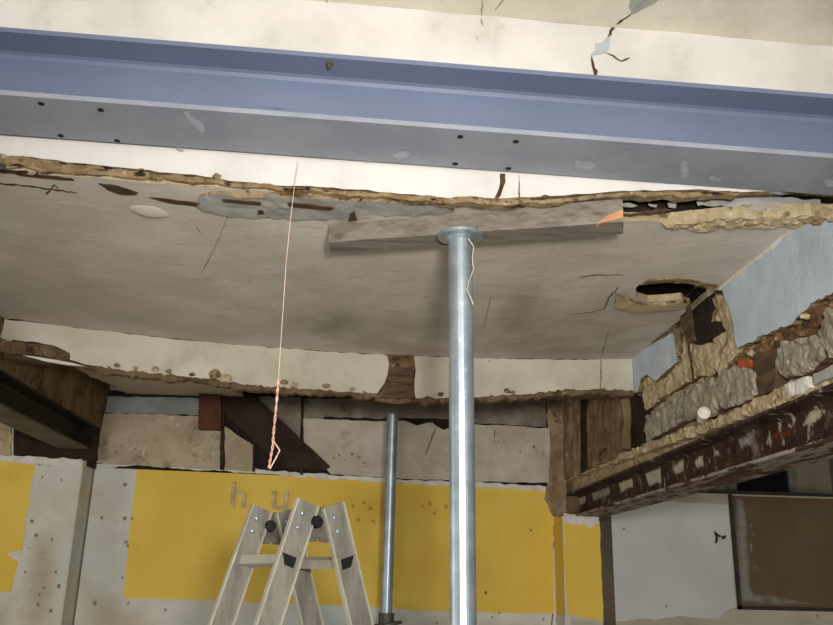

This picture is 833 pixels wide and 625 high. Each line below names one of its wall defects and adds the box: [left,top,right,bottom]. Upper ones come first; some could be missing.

peeling [629,0,658,15]
peeling [591,35,611,58]
flaking render [0,153,833,411]
crack [563,274,619,388]
peeling [803,409,826,426]
peeling [738,435,754,449]
peeling [673,460,684,474]
peeling [645,468,662,486]
peeling [579,479,633,505]